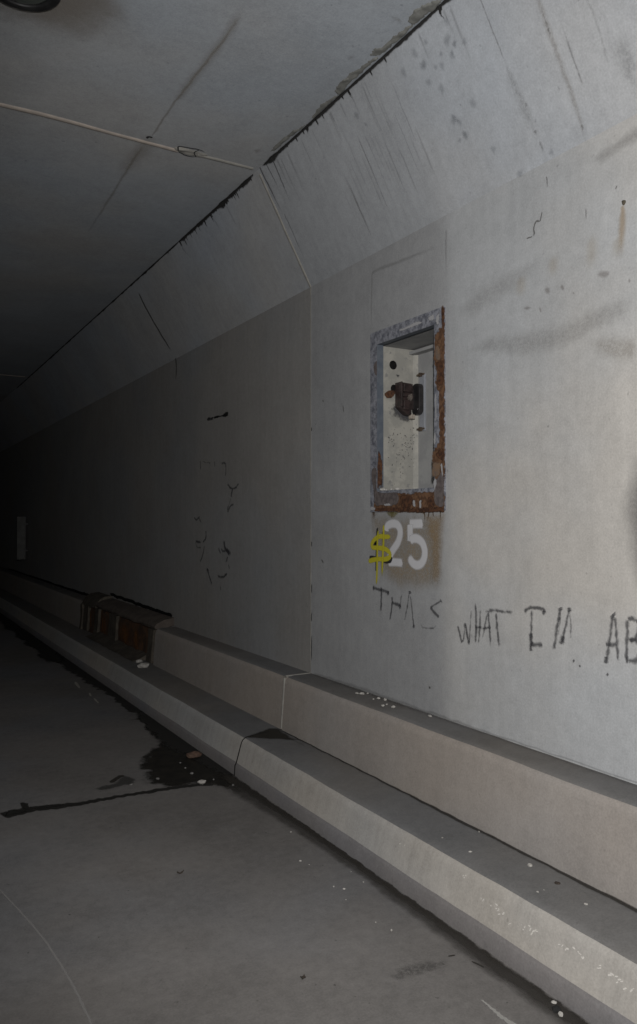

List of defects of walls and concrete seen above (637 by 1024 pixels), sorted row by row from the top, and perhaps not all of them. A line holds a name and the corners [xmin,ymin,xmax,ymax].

damp [17,0,451,388]
damp [137,712,237,790]